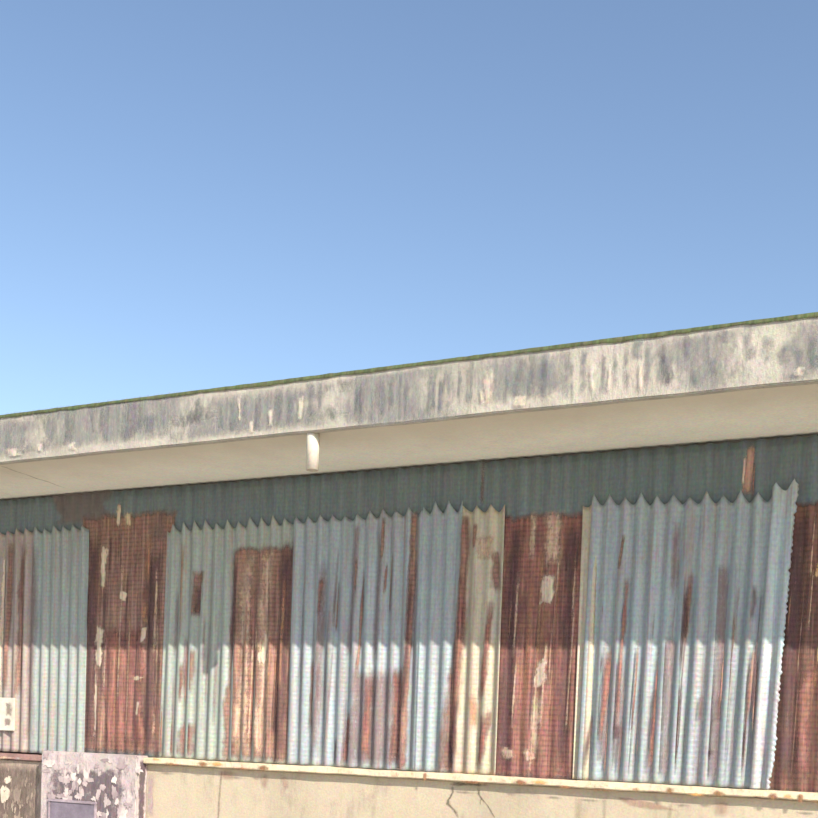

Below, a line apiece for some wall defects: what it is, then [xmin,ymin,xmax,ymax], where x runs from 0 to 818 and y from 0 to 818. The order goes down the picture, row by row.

damp [37,388,321,446]
damp [345,367,472,423]
damp [484,359,570,395]
damp [602,340,649,382]
rust [0,547,34,691]
rust [83,505,192,765]
rust [199,545,293,770]
rust [334,514,417,768]
rust [438,512,583,788]
rust [765,502,818,802]
peeling [0,750,153,818]
crack [447,783,493,815]